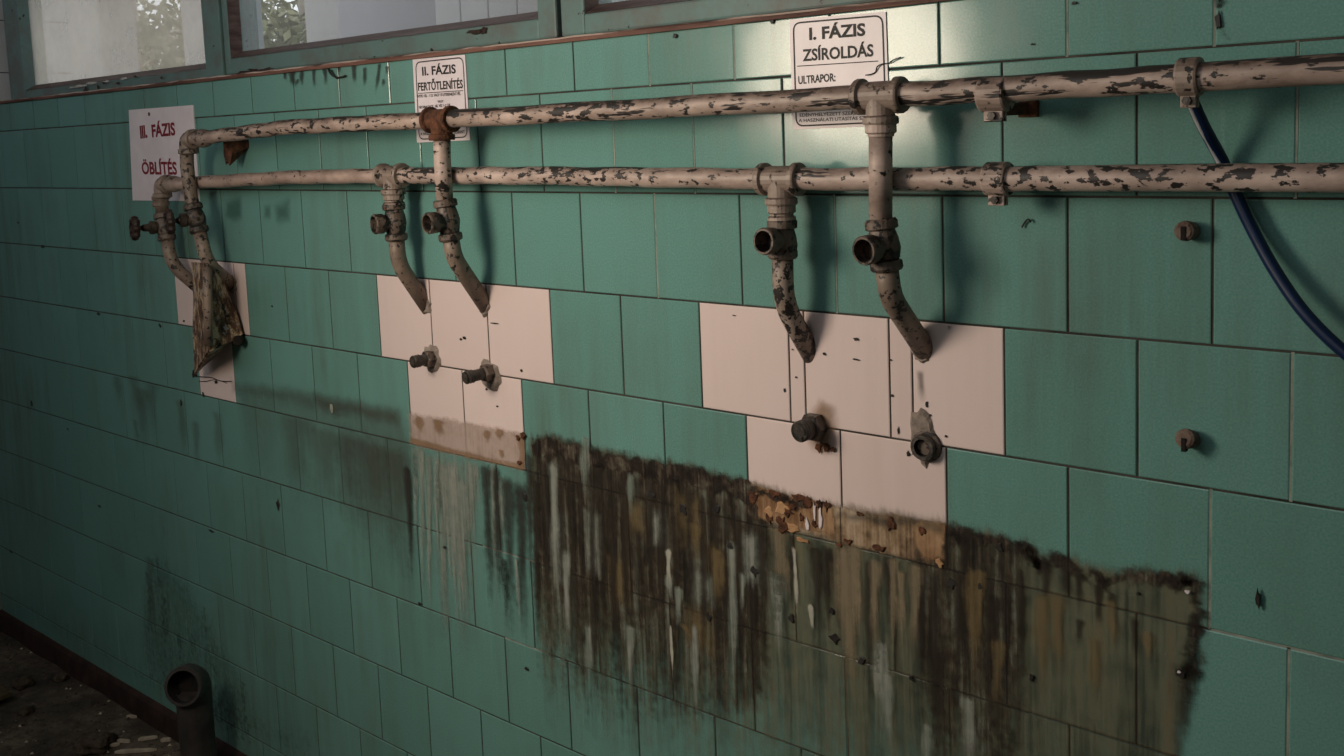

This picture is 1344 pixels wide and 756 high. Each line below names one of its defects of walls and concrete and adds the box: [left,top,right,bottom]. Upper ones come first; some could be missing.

leakage [404,435,1206,756]